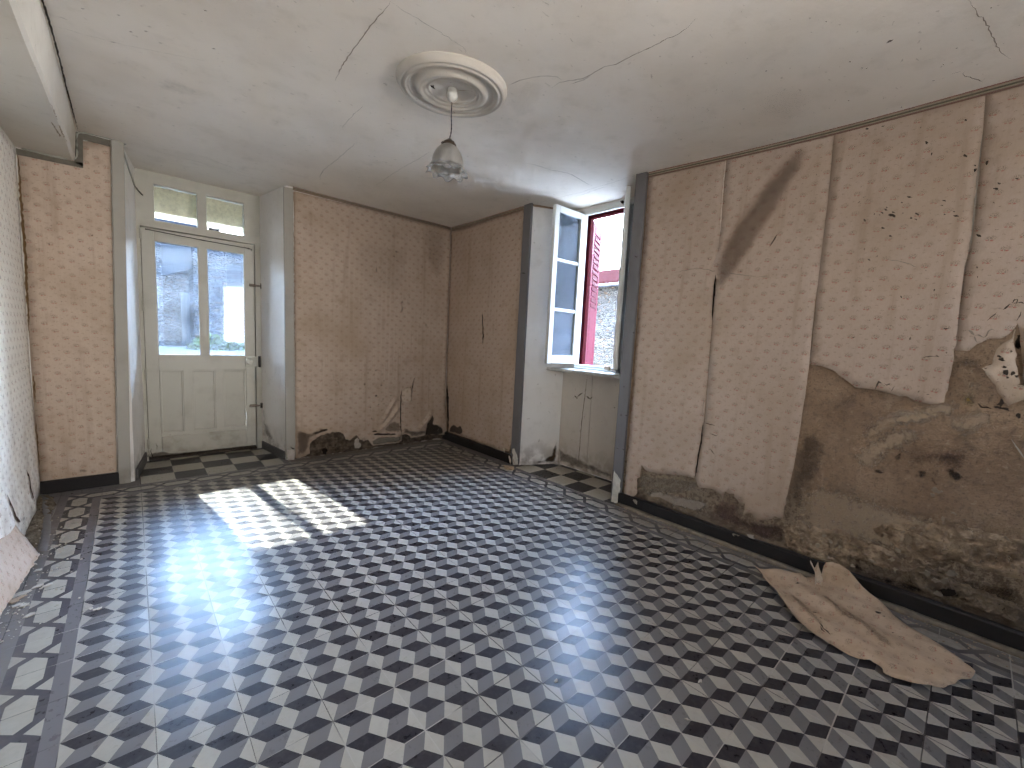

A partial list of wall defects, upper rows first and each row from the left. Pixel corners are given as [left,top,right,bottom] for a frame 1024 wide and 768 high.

crack [335,3,466,81]
crack [512,28,687,88]
crack [968,0,1007,57]
water stain [722,164,795,277]
peeling [982,329,1024,406]
spalling [287,432,443,461]
spalling [633,494,1024,628]